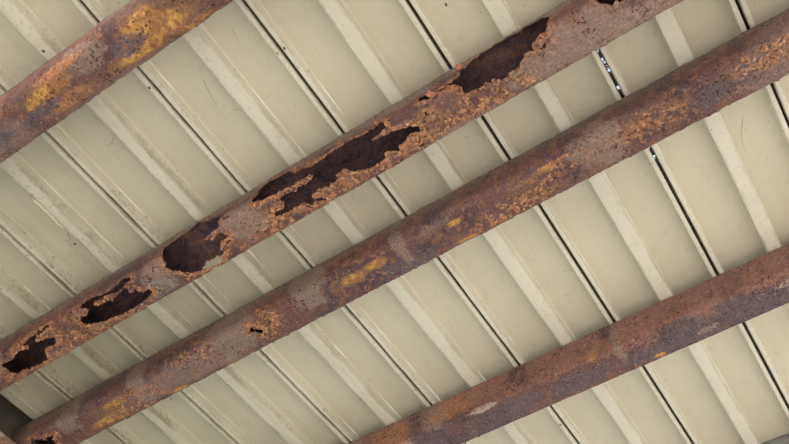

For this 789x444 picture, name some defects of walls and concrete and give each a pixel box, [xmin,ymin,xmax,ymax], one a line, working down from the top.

rust [119,7,209,64]
rust [25,49,95,120]
rust [427,59,550,141]
rust [604,100,691,148]
rust [251,151,418,244]
rust [461,151,585,242]
rust [342,257,385,285]
rust [12,296,162,384]
rust [95,382,186,427]
rust [429,373,508,423]